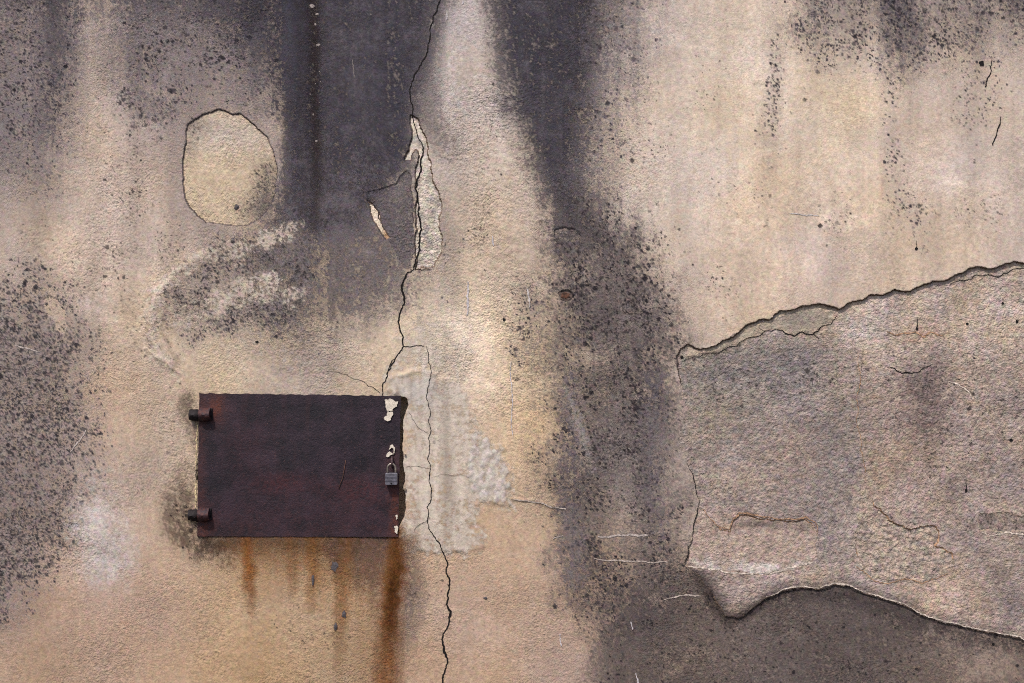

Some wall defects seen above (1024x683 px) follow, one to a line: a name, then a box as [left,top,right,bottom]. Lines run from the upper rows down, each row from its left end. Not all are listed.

damp [0,259,113,624]
spalling [182,109,278,226]
damp [115,0,450,371]
corrosion [381,552,403,683]
crack [330,0,465,683]
spalling [367,115,443,270]
damp [488,0,1024,683]
spalling [676,261,1024,640]